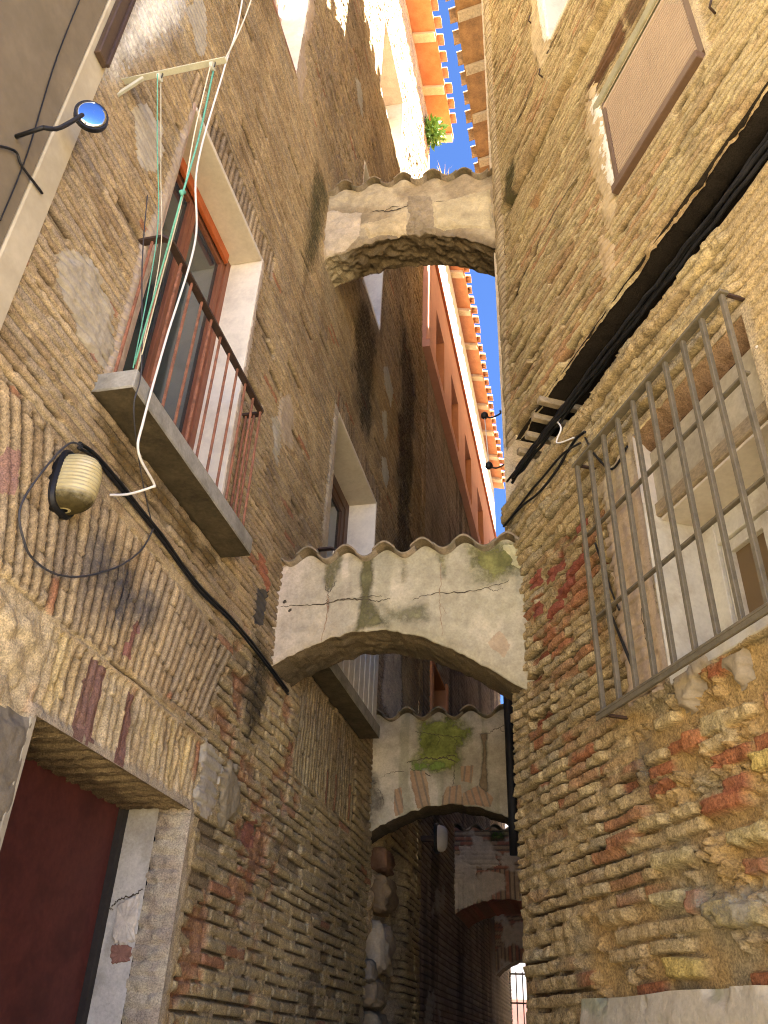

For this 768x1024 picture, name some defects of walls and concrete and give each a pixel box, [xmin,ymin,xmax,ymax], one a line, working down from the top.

crack [281,565,509,641]
flaking render [394,765,493,816]
flaking render [109,894,140,964]